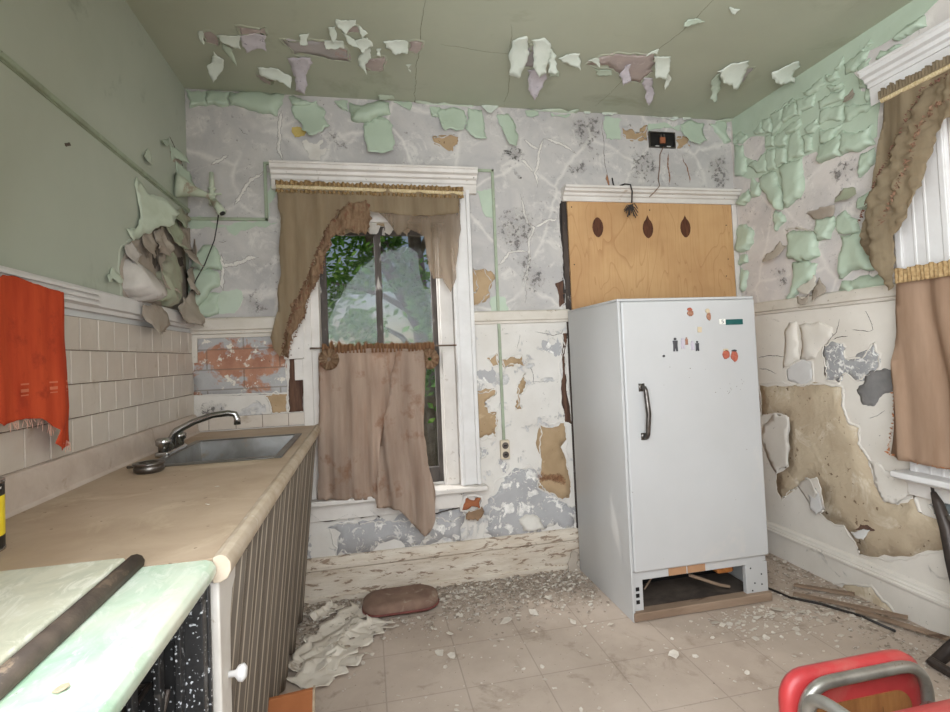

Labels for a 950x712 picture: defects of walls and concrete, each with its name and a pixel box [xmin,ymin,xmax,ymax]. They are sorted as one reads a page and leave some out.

peeling [185,19,425,135]
peeling [334,95,518,154]
peeling [508,0,938,309]
peeling [107,173,278,335]
spalling [472,267,508,311]
spalling [193,336,290,414]
peeling [326,332,576,556]
spalling [759,339,950,563]